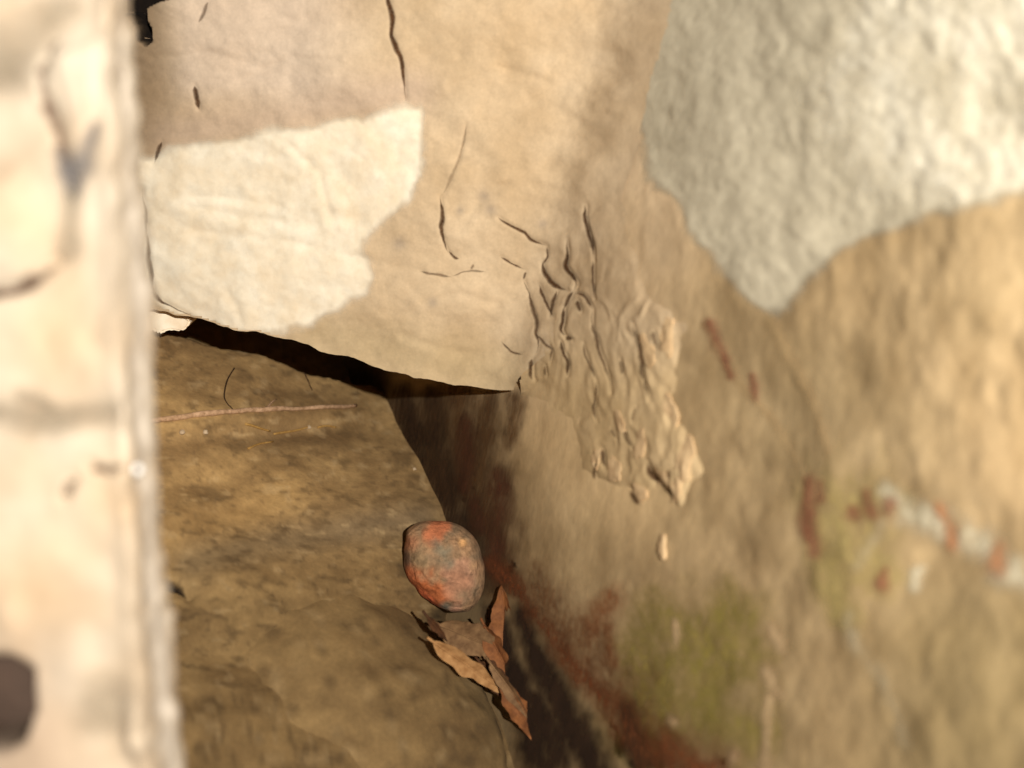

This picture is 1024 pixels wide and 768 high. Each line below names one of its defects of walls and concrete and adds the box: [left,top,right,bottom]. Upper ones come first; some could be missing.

spalling [139,104,424,334]
crack [386,0,405,86]
crack [439,204,457,259]
crack [500,208,657,478]
spalling [641,0,1024,315]